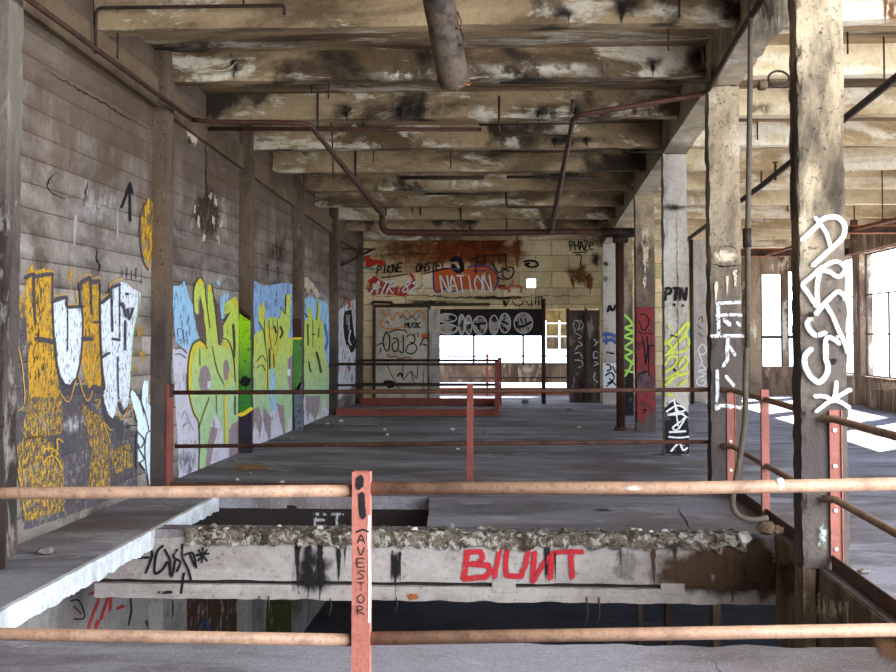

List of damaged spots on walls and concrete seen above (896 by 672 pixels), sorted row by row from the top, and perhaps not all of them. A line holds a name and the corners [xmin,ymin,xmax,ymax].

water stain [646,5,678,16]
water stain [536,64,586,75]
water stain [473,107,493,121]
rust [382,240,522,271]
rust [568,265,594,294]
spalling [186,523,352,550]
spalling [372,523,747,581]
rust [650,536,795,602]